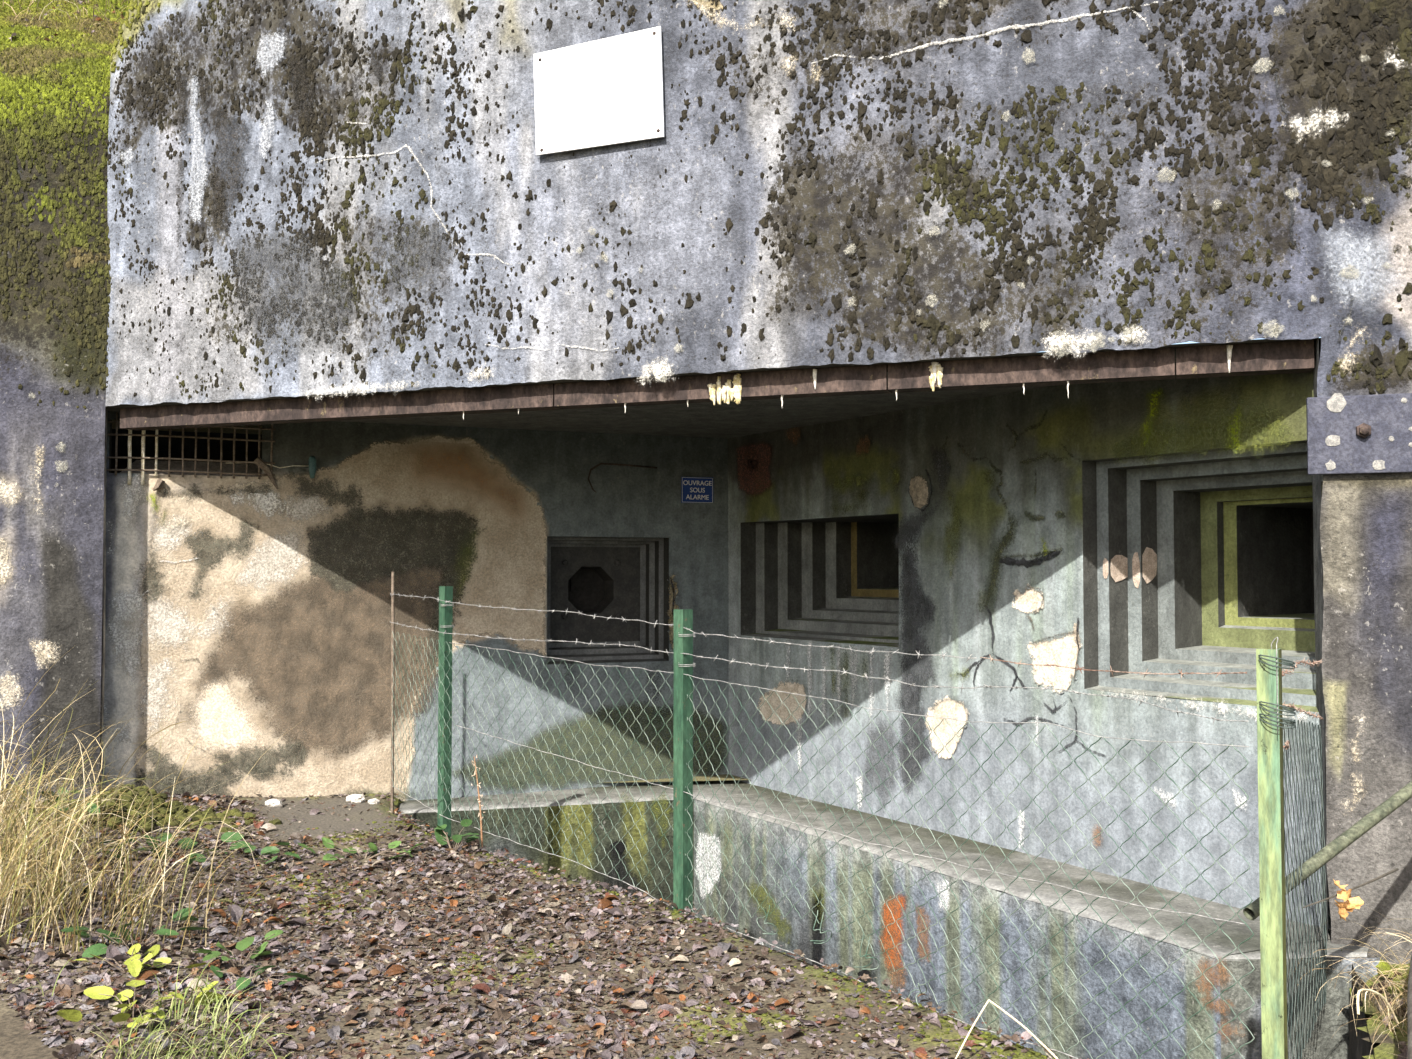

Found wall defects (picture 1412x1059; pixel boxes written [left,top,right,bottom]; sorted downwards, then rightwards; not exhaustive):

spalling [692,0,747,28]
crack [812,1,1158,63]
damp [1291,111,1348,140]
damp [640,359,671,385]
damp [1044,335,1097,355]
crack [943,411,1104,756]
peeling [1103,547,1157,588]
damp [100,472,484,796]
spalling [1012,584,1082,694]
spalling [757,679,806,725]
spalling [925,695,968,759]
corrosion [881,896,931,989]